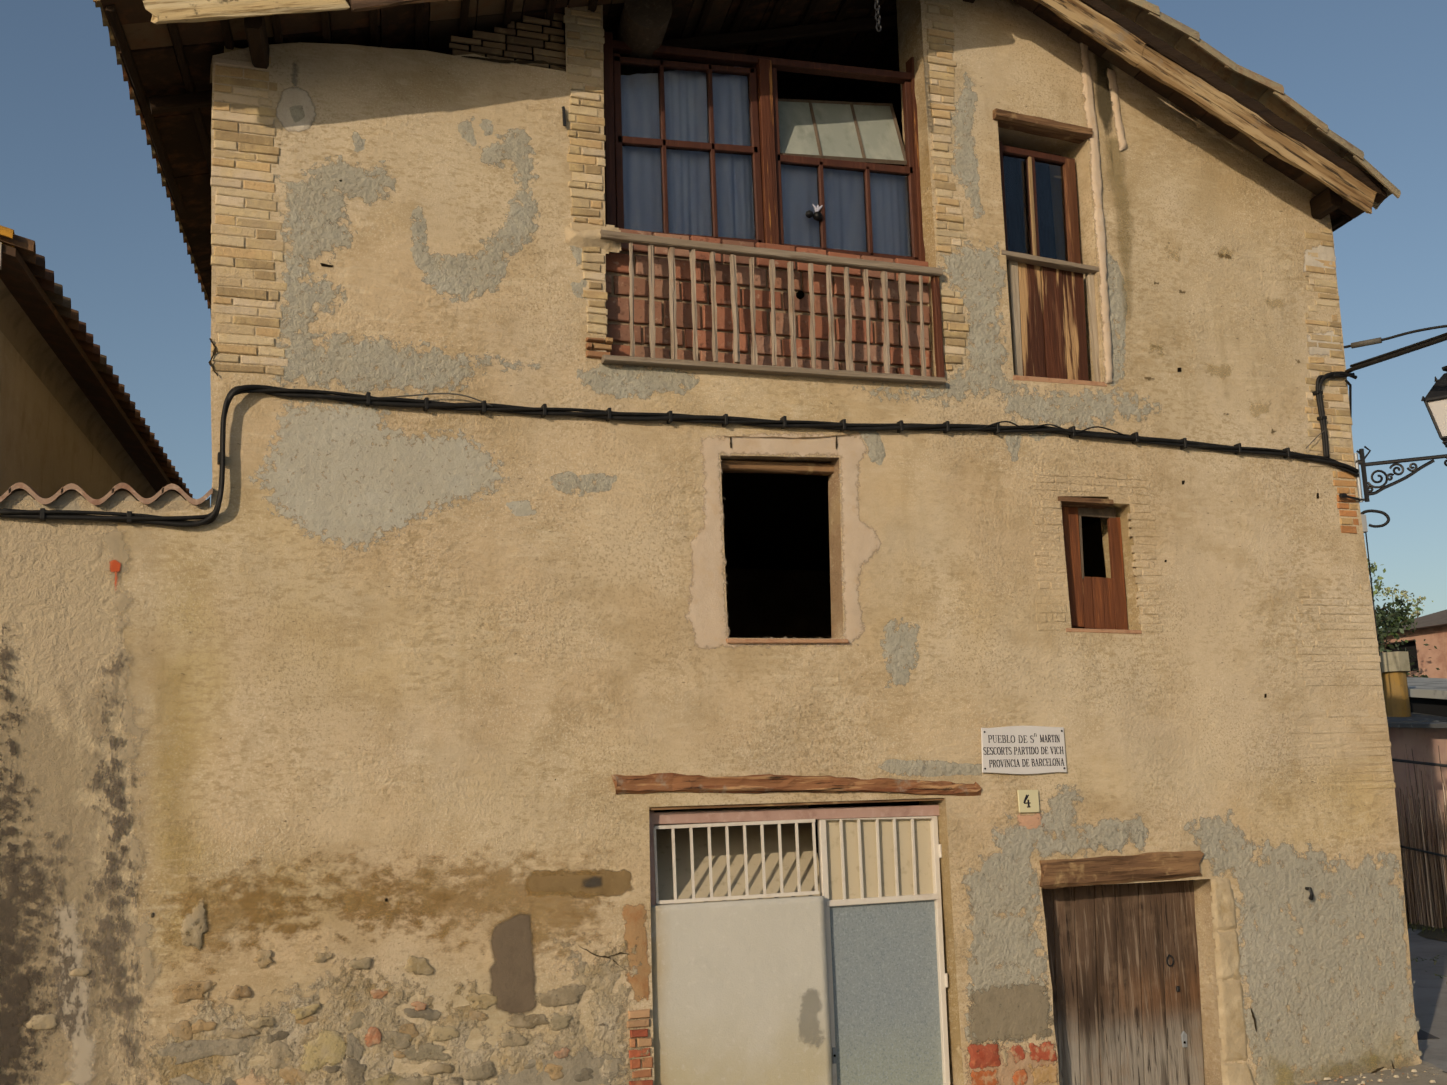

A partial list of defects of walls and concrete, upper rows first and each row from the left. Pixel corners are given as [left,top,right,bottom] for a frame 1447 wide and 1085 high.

peeling [458,116,496,146]
peeling [410,206,432,273]
damp [0,626,158,1085]
damp [583,877,601,887]